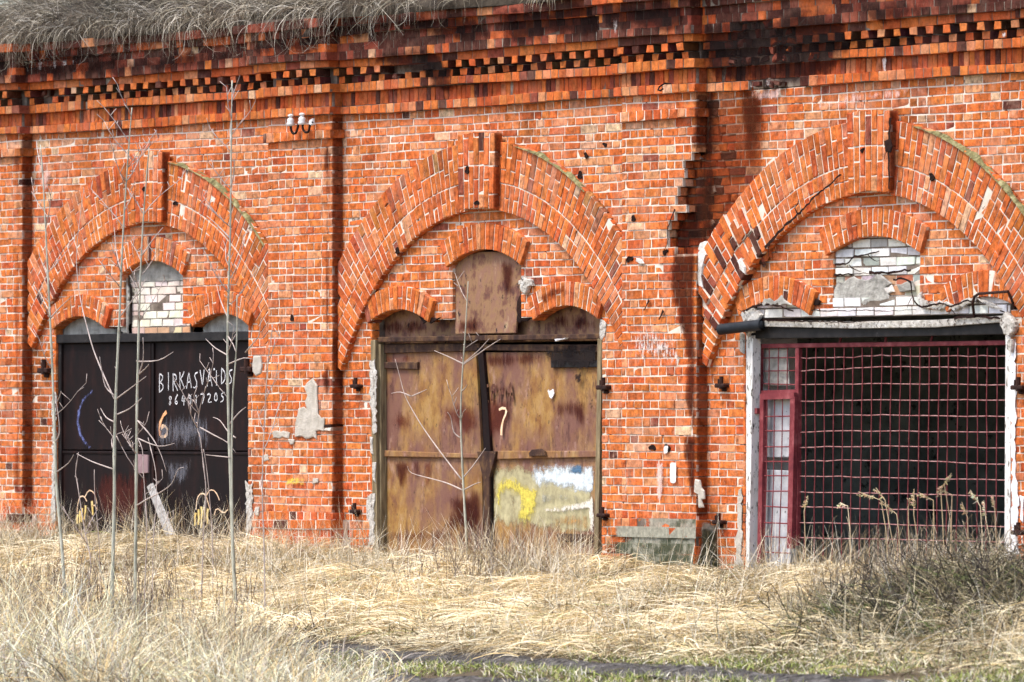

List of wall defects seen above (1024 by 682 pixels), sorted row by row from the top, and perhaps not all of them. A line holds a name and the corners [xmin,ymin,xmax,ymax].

rust [503,264,511,290]
rust [397,464,417,484]
rust [421,493,478,538]